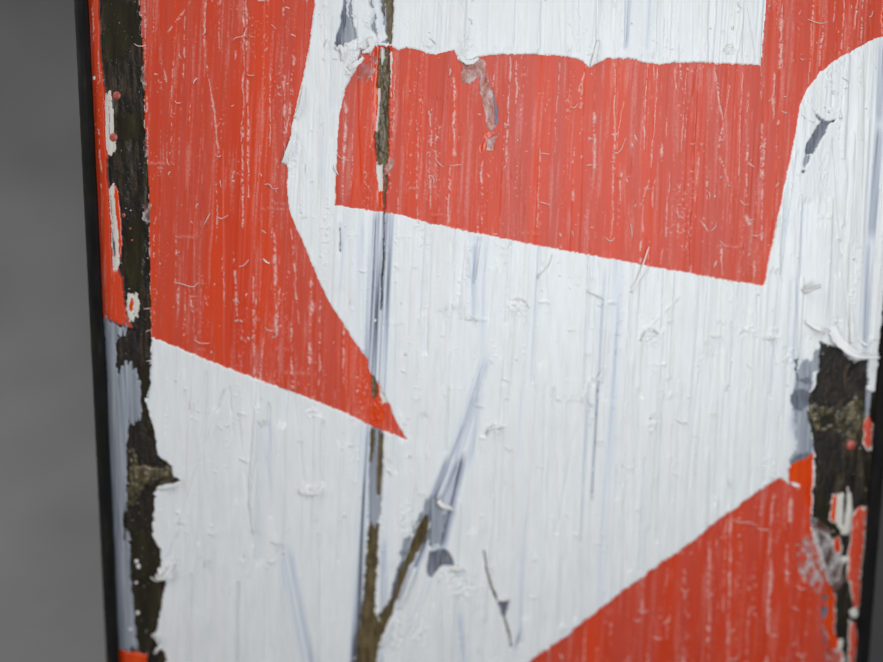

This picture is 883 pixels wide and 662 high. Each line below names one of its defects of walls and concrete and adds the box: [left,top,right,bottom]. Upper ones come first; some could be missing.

peeling [486,135,498,151]
spalling [801,113,835,173]
peeling [93,0,181,662]
peeling [788,296,880,662]